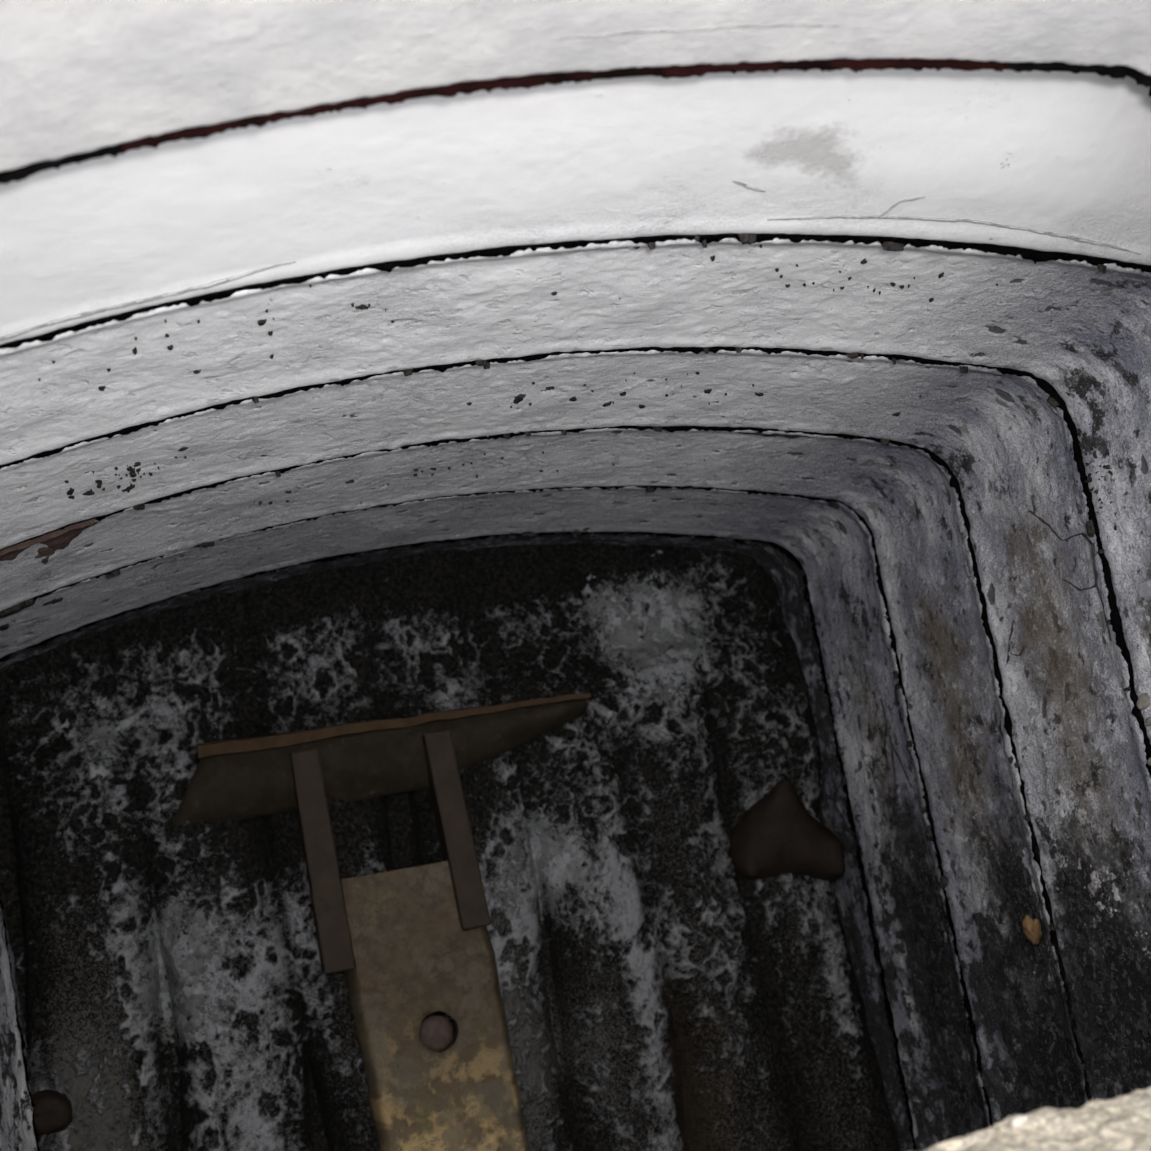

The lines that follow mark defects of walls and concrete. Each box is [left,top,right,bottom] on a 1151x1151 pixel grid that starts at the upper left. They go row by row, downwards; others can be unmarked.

crack [0,58,1151,184]
peeling [0,518,98,564]
hole [65,462,159,499]
crack [0,346,1151,776]
efflorescence [567,549,717,711]
spalling [1137,573,1151,660]
efflorescence [62,696,137,782]
crack [0,425,1092,1151]
efflorescence [588,699,616,723]
efflorescence [490,803,607,935]
water stain [121,883,235,1053]
water stain [138,1063,158,1087]